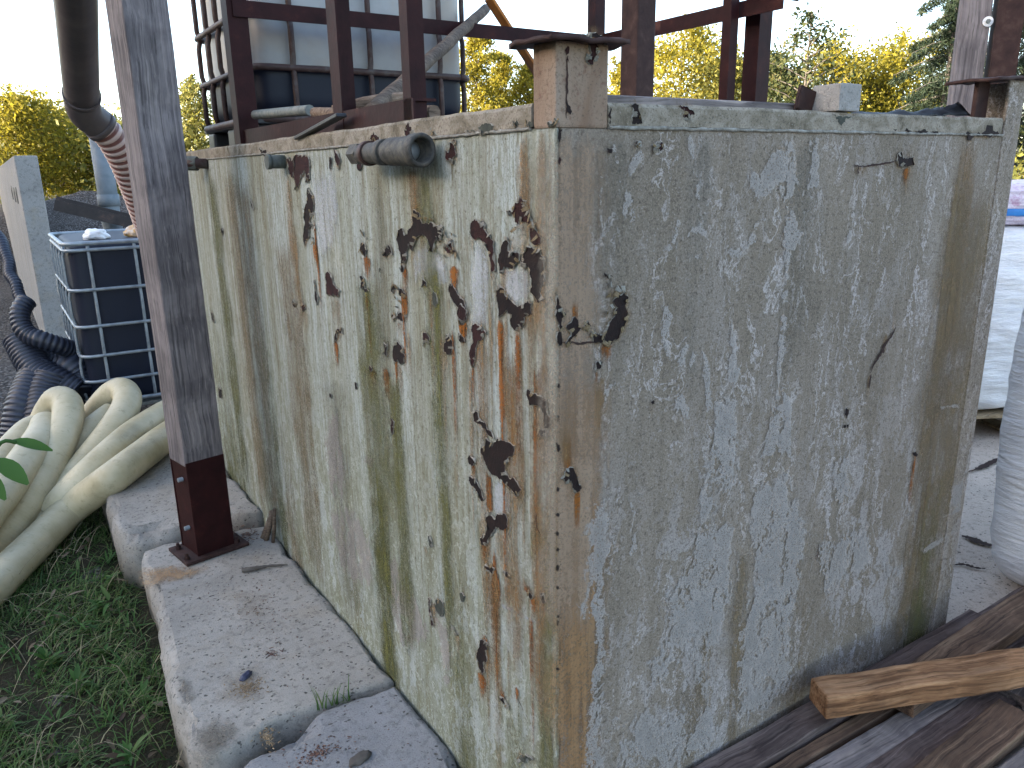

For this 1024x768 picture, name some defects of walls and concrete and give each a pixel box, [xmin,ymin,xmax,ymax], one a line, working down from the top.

water stain [227,184,317,566]
peeling [286,154,318,262]
water stain [431,272,453,624]
peeling [358,186,629,697]
corrosion [469,136,609,768]
water stain [898,205,989,645]